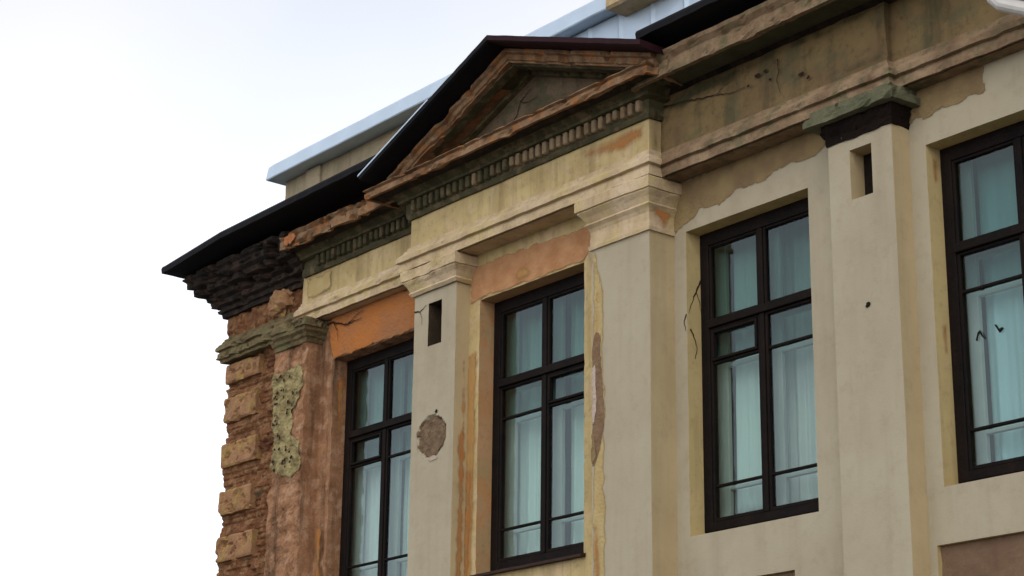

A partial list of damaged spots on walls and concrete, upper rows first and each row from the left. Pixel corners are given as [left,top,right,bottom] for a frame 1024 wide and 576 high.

crack [663,80,744,108]
flaking render [909,65,985,124]
flaking render [674,132,825,233]
crack [327,314,361,341]
crack [684,280,701,359]
spalling [259,355,304,478]
spalling [416,409,446,461]
flaking render [470,227,606,576]